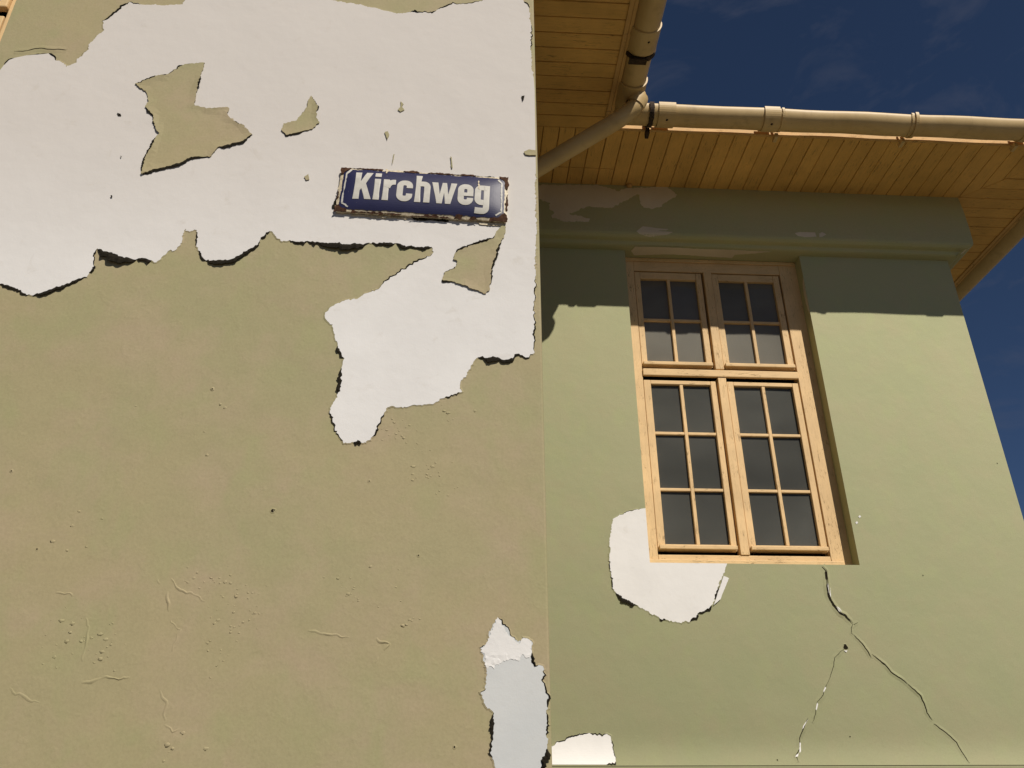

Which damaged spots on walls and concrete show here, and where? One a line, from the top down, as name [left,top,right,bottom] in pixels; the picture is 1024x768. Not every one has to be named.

peeling [0,0,678,445]
peeling [478,616,617,768]
peeling [608,508,729,625]
crack [793,564,971,764]